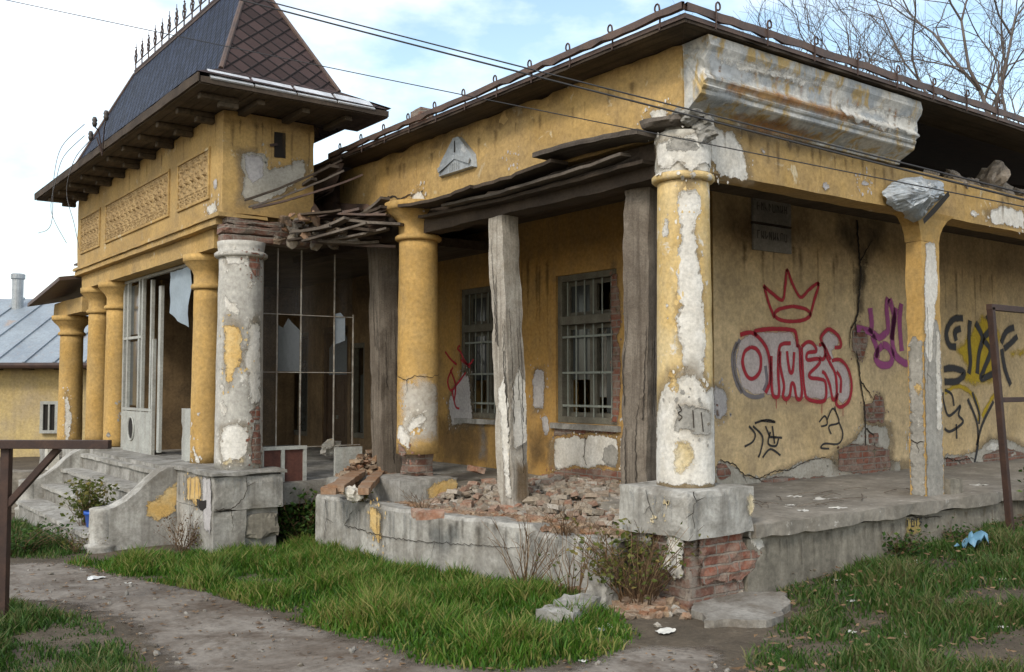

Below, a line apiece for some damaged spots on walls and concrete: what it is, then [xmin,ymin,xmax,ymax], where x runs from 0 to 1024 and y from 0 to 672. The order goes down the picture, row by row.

rust [734,116,814,141]
rust [728,76,867,121]
spalling [238,132,313,204]
peeling [637,98,1024,544]
crack [849,220,875,461]
peeling [216,294,263,469]
peeling [529,271,624,481]
peeling [397,403,427,465]
crack [215,478,255,530]
crack [324,501,518,551]
spalling [659,536,685,579]
flaking render [699,532,764,585]